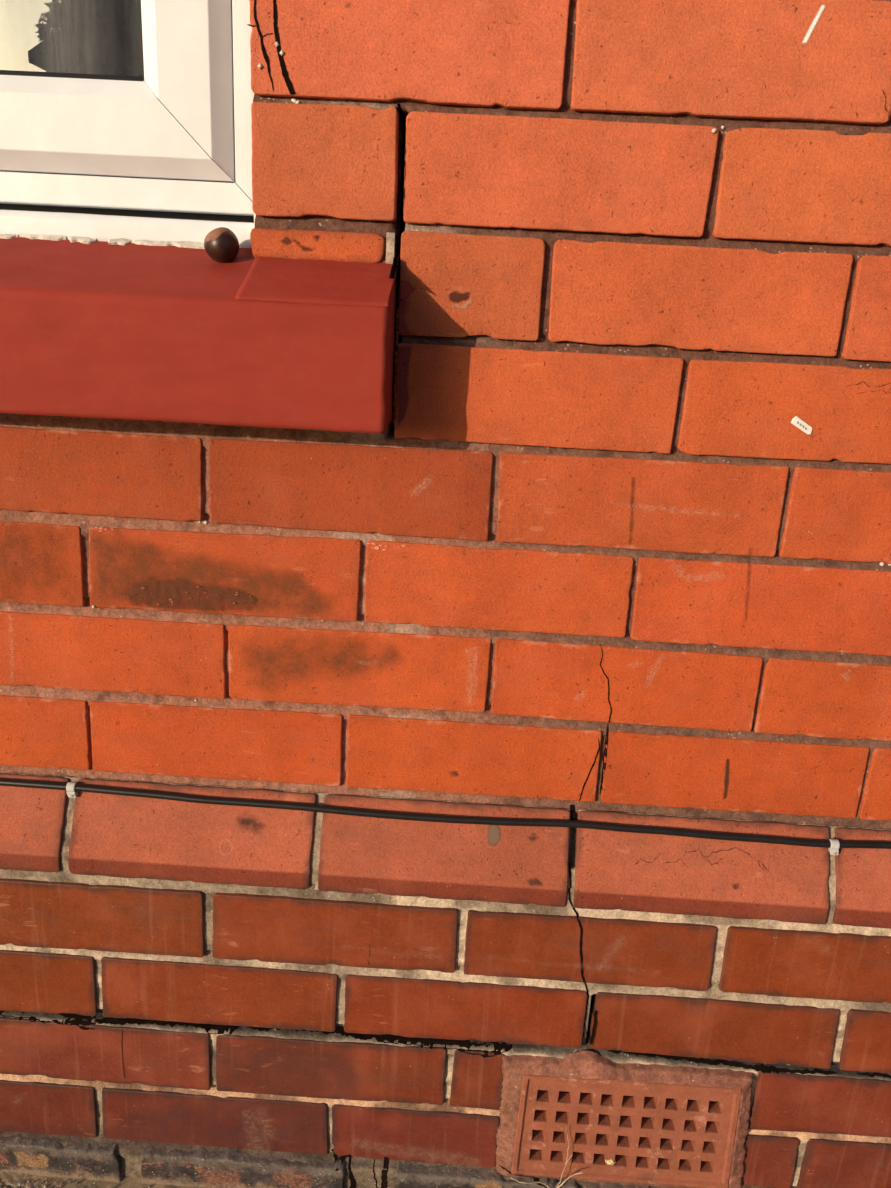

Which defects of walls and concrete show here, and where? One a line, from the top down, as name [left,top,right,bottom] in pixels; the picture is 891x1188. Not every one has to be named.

crack [247,0,296,97]
crack [389,104,406,280]
leakage [97,539,322,611]
crack [568,644,891,1079]
crack [0,1010,512,1079]
crack [331,1149,389,1188]